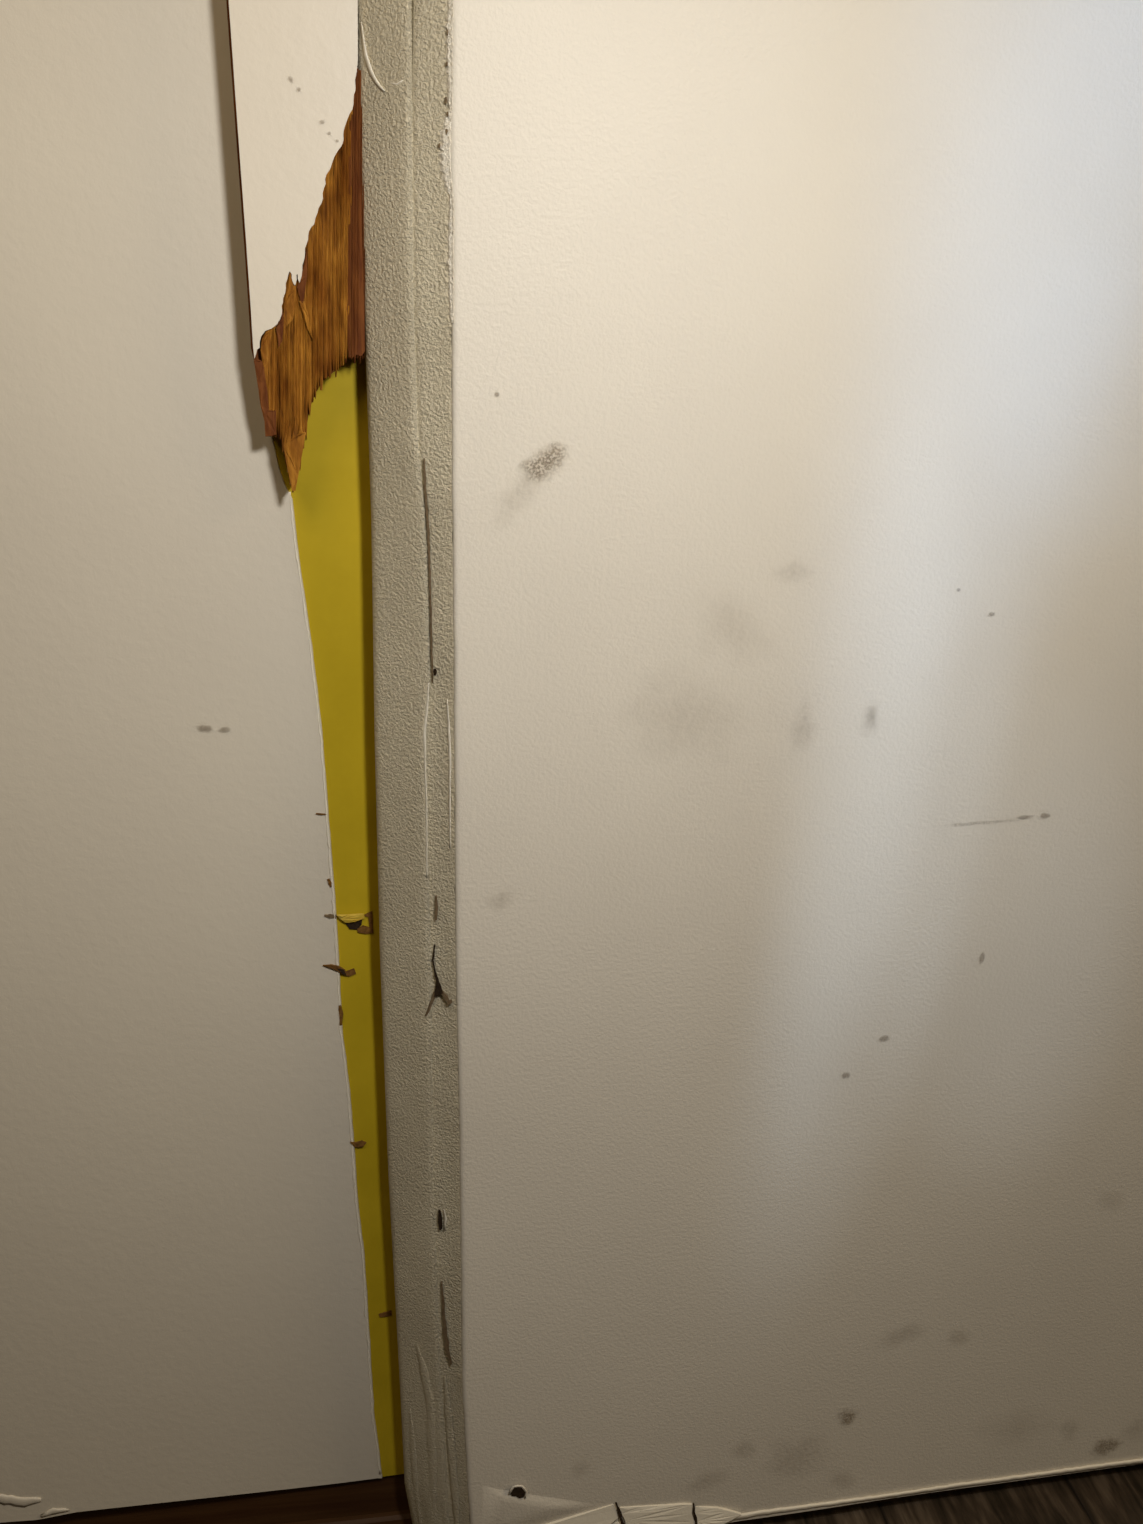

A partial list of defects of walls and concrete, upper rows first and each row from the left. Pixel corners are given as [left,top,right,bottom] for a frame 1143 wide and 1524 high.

crack [423,458,452,1016]
peeling [547,1502,741,1524]